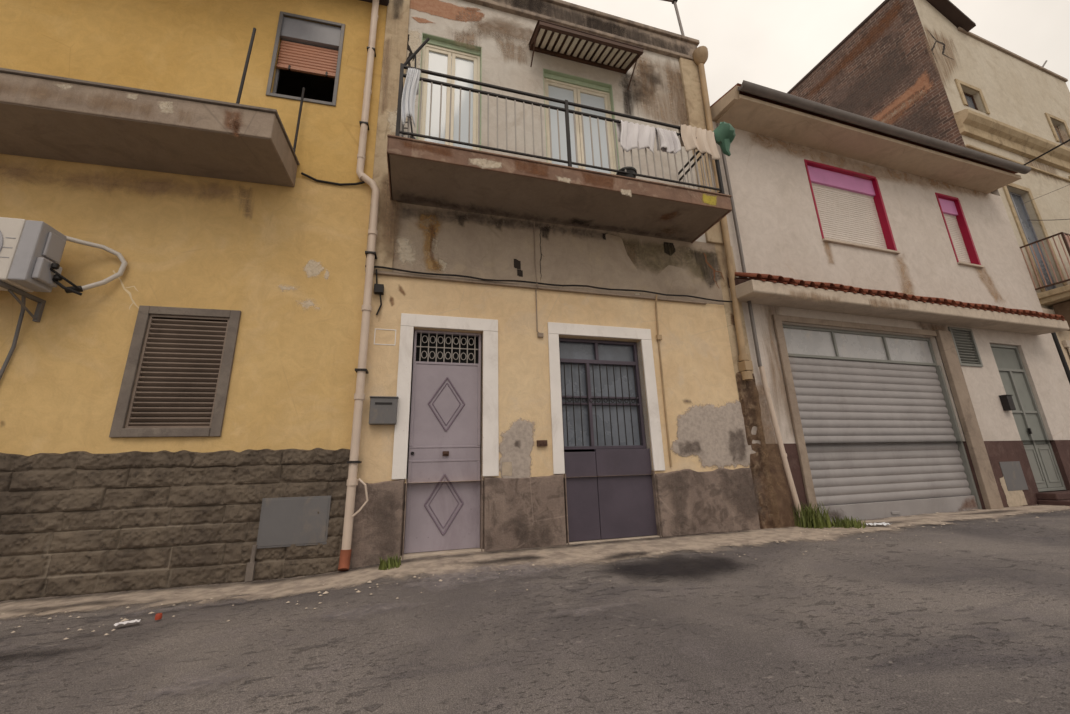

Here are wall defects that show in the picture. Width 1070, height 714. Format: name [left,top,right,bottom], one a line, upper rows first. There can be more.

flaking render [405,0,484,80]
water stain [456,22,533,61]
water stain [498,0,687,55]
crack [929,32,954,61]
water stain [623,57,689,125]
flaking render [388,111,407,132]
water stain [382,179,719,287]